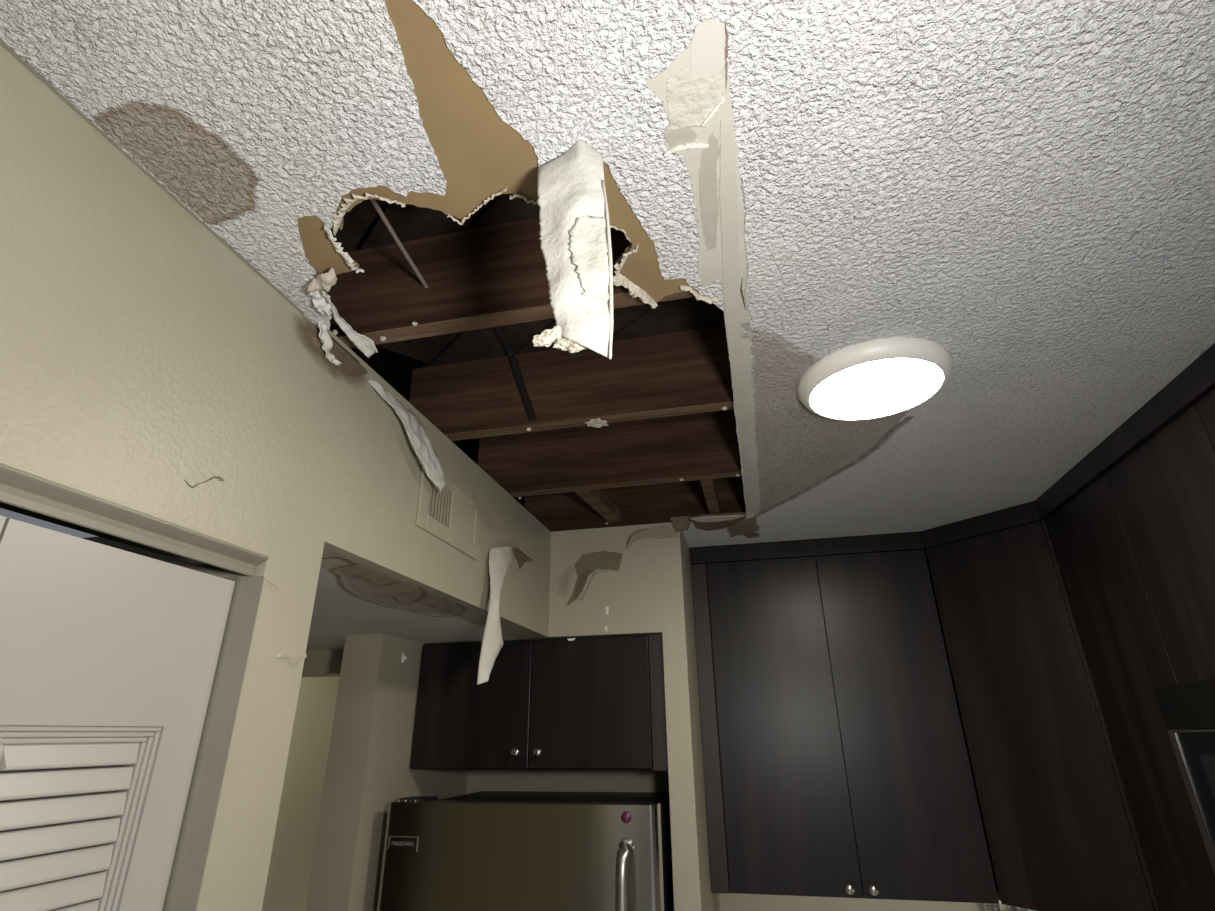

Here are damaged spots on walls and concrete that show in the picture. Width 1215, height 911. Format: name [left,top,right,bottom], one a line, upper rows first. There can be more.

leakage [95,102,258,224]
peeling [569,215,609,301]
peeling [646,19,761,514]
peeling [368,379,445,492]
peeling [566,525,678,606]